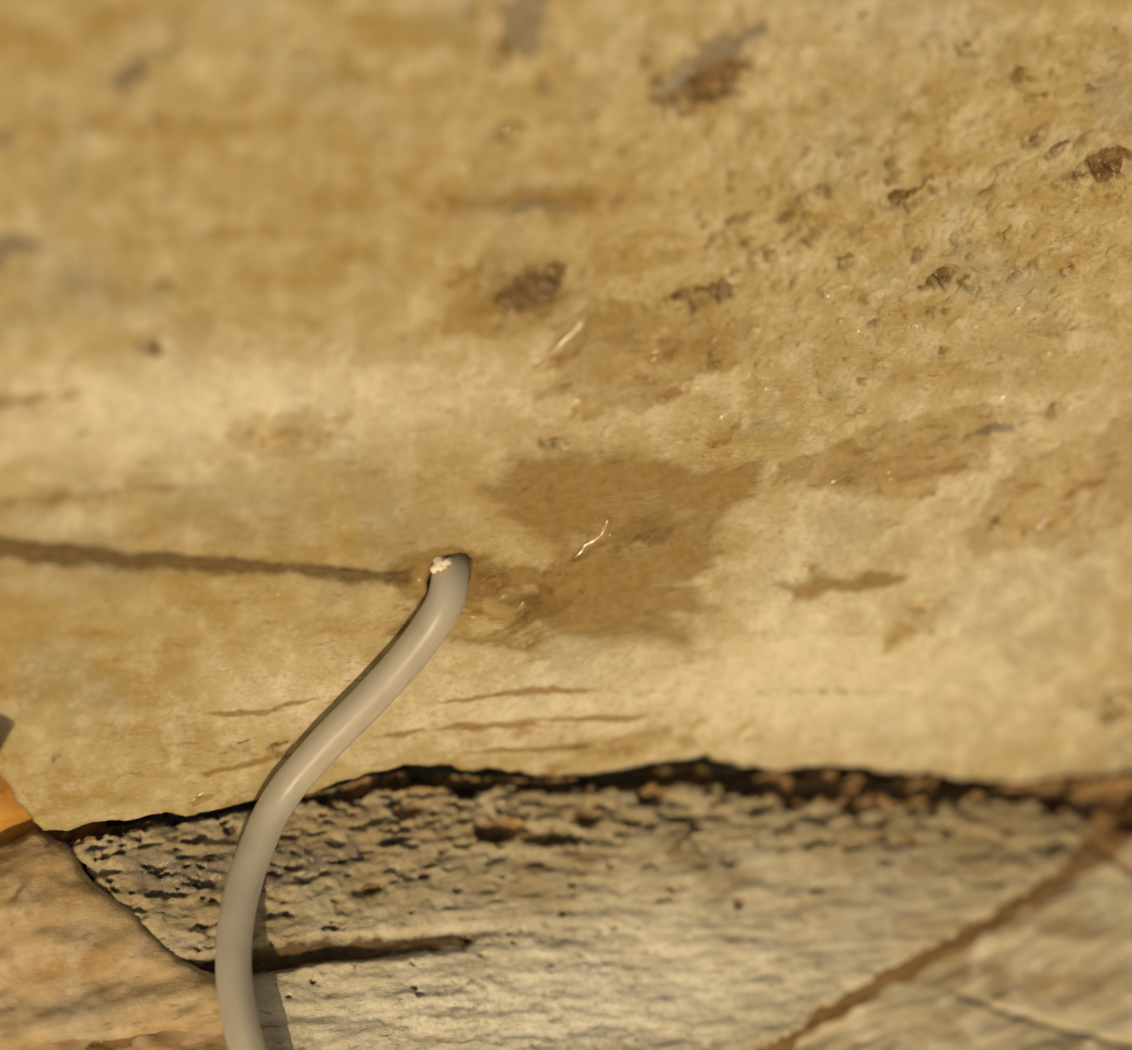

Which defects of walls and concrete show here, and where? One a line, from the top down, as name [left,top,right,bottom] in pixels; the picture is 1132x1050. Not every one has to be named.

crack [0,537,409,583]
damp [391,460,759,645]